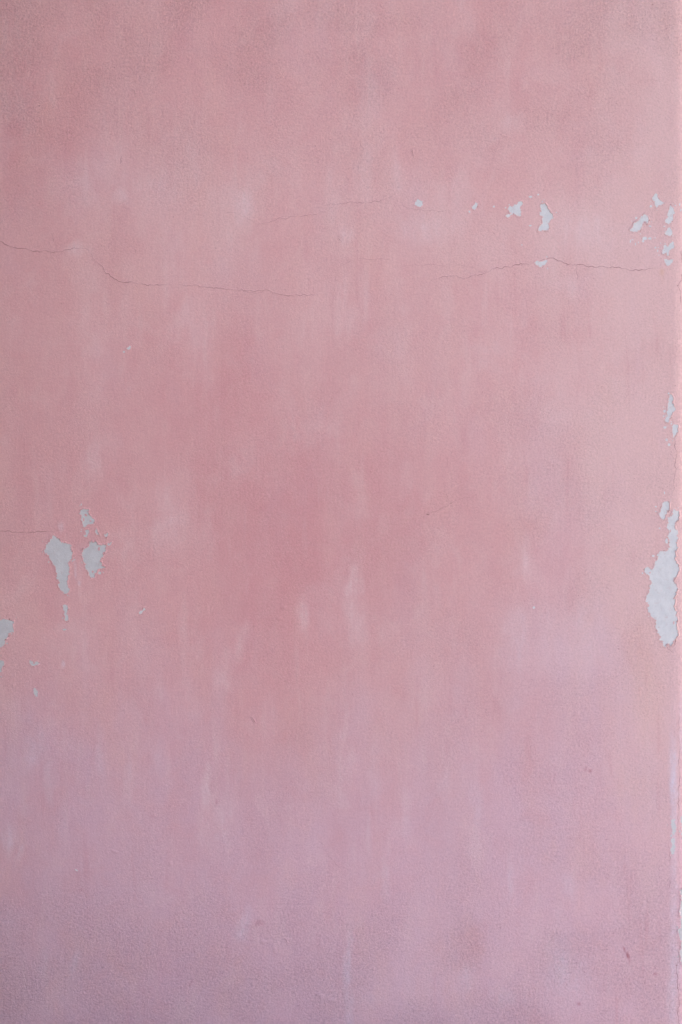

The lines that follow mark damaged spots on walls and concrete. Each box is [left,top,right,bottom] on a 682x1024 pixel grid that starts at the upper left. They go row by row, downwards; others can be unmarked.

peeling [493,194,557,233]
peeling [628,192,681,268]
crack [0,240,682,302]
peeling [42,503,113,631]
peeling [642,492,681,649]